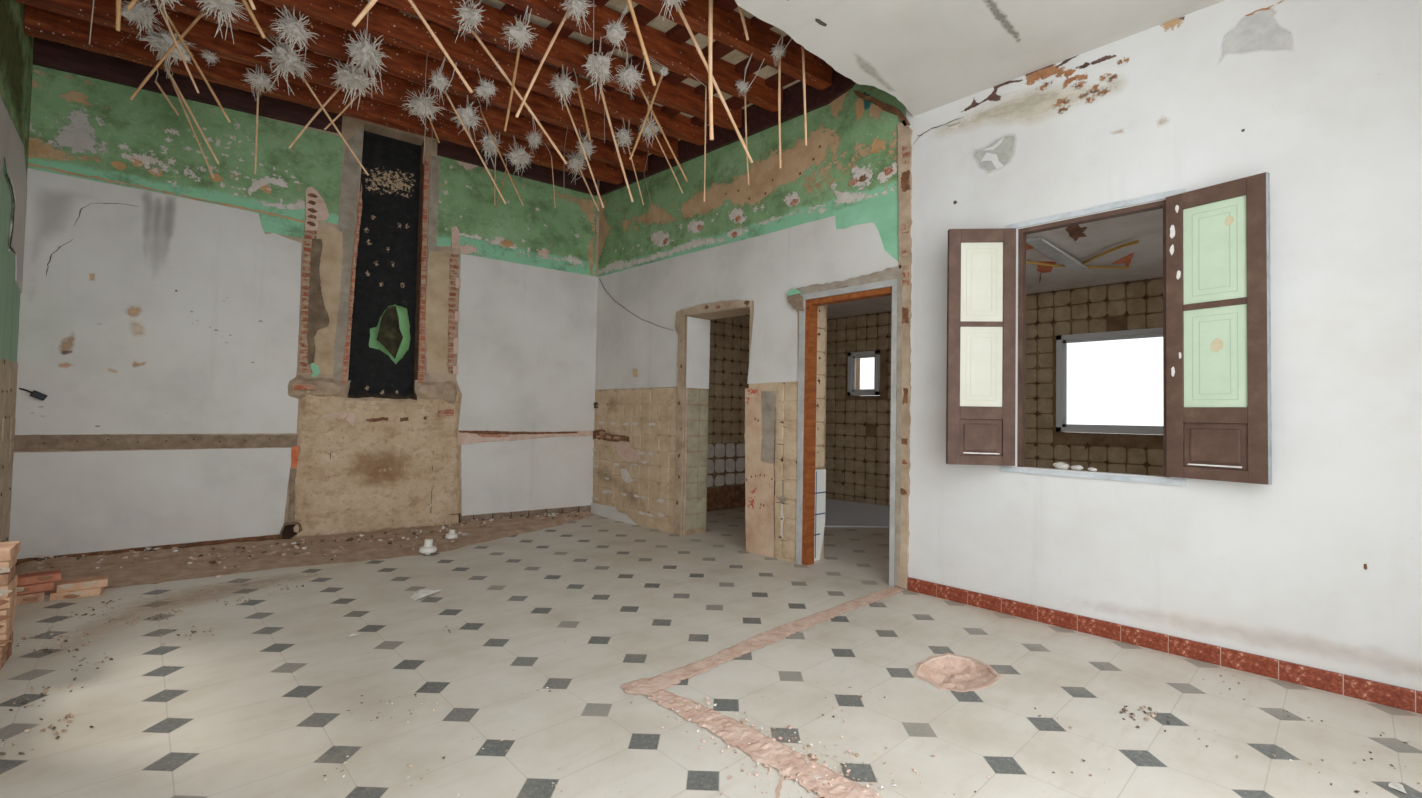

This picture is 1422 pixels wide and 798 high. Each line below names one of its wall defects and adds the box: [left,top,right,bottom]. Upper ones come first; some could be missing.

spalling [962,55,1129,114]
peeling [4,157,15,254]
spalling [28,70,913,589]